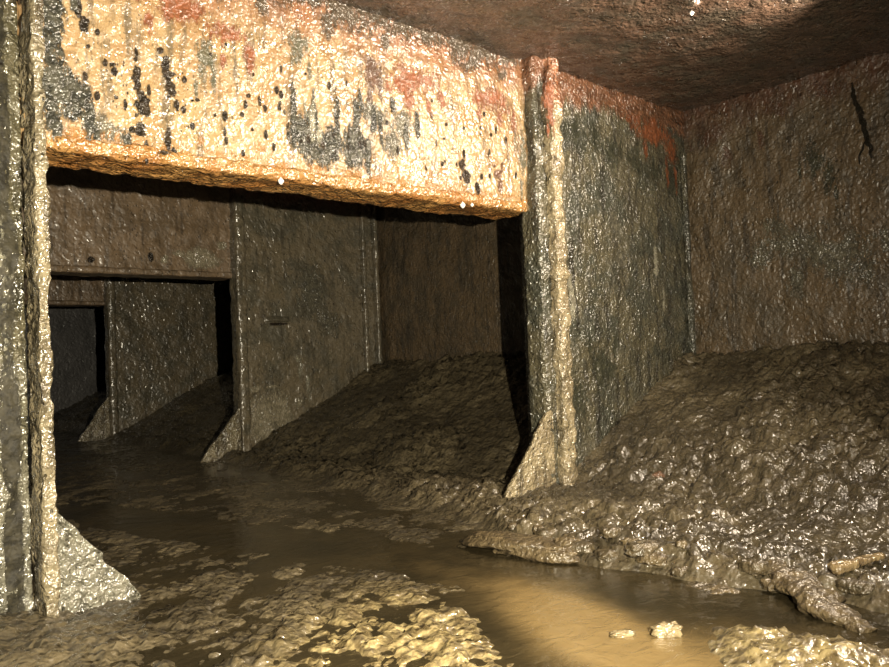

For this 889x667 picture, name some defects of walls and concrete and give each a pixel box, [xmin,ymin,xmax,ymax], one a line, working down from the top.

water stain [42,0,132,145]
rust [144,0,255,75]
water stain [194,39,217,97]
water stain [321,11,337,40]
water stain [284,31,421,177]
rust [363,55,445,118]
rust [472,86,517,132]
rust [480,155,515,198]
rust [543,83,556,138]
water stain [560,116,675,195]
crack [851,82,874,164]
water stain [572,326,617,423]